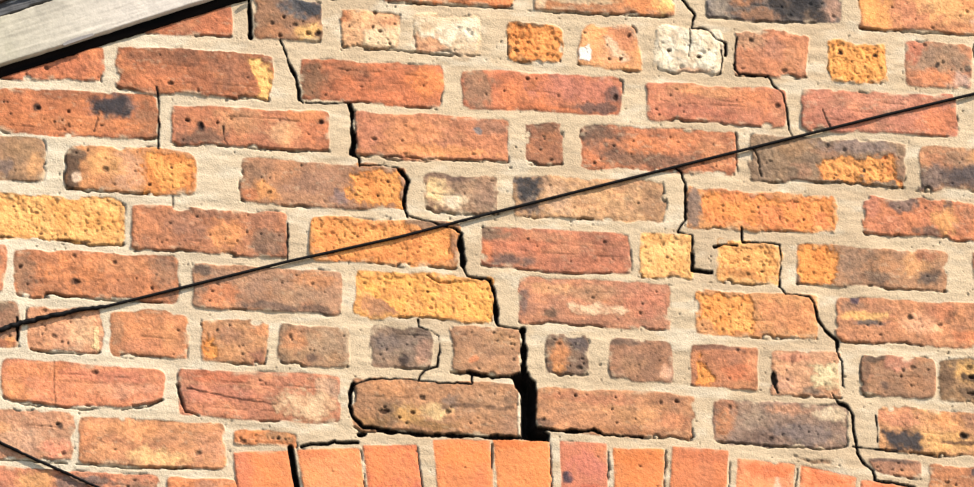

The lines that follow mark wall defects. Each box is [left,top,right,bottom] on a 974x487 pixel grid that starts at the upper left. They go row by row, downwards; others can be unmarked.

crack [246,1,254,40]
crack [681,0,789,130]
crack [280,40,643,487]
crack [675,168,914,487]